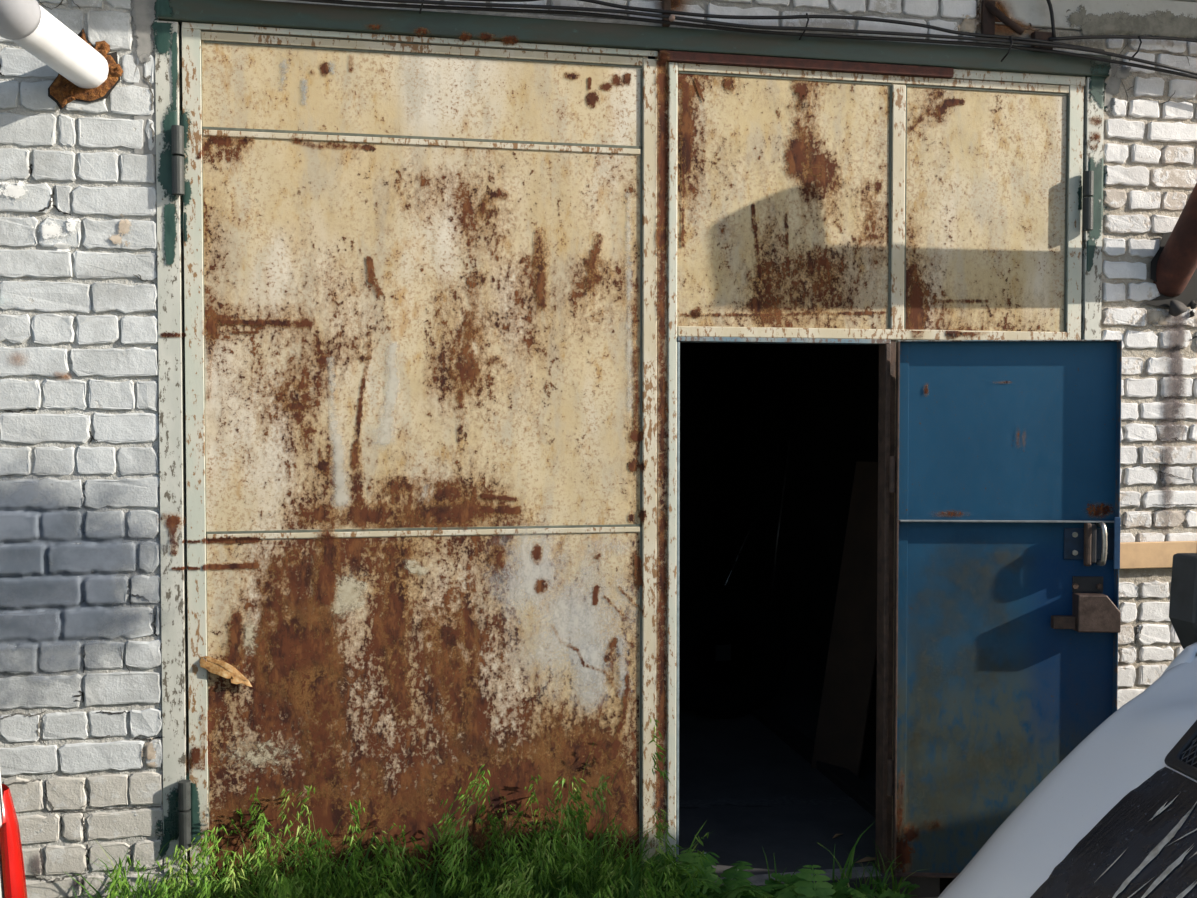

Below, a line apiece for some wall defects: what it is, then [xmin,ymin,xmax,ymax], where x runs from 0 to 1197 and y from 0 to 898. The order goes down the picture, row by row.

corrosion [156,50,1064,898]
water stain [1163,314,1185,503]